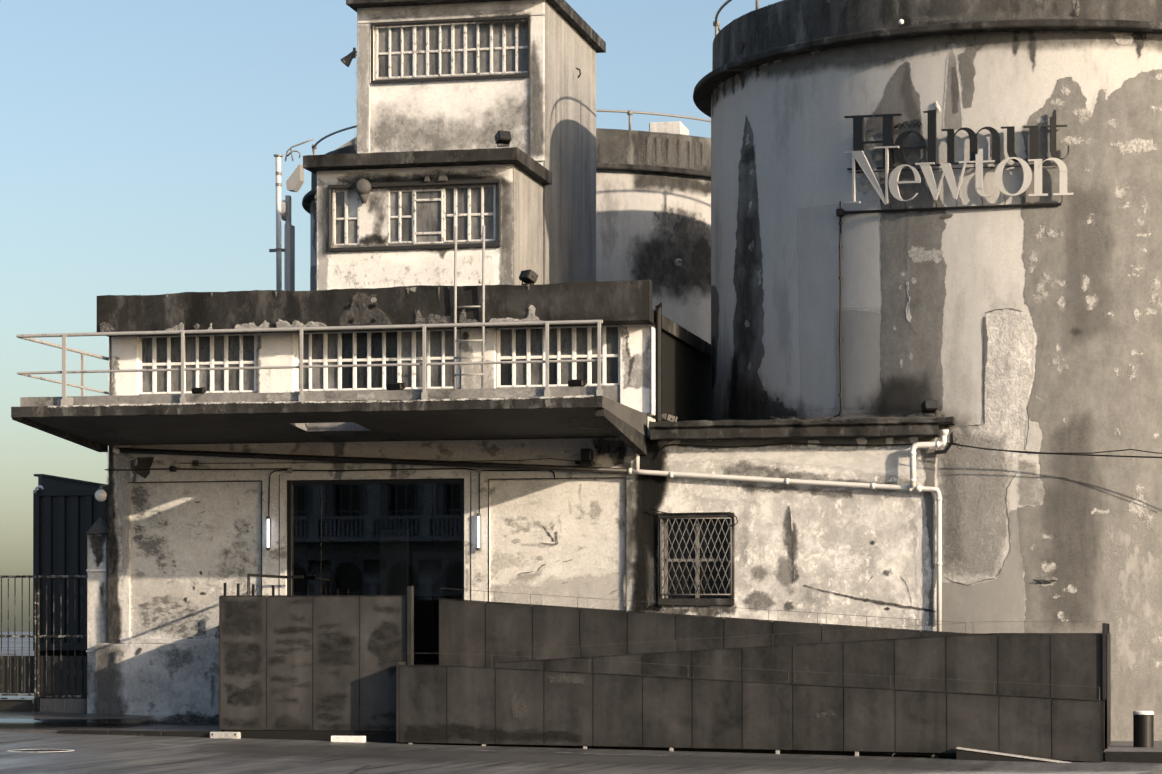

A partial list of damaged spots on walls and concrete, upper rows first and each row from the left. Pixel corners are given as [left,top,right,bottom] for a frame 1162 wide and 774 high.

damp [711,0,1162,119]
peeling [943,43,983,129]
spalling [234,292,392,332]
damp [48,332,593,414]
damp [360,196,388,245]
damp [620,326,651,389]
damp [632,208,719,387]
peeling [730,116,768,402]
peeling [856,61,953,411]
peeling [938,69,1162,751]
damp [0,445,220,724]
damp [490,436,937,626]